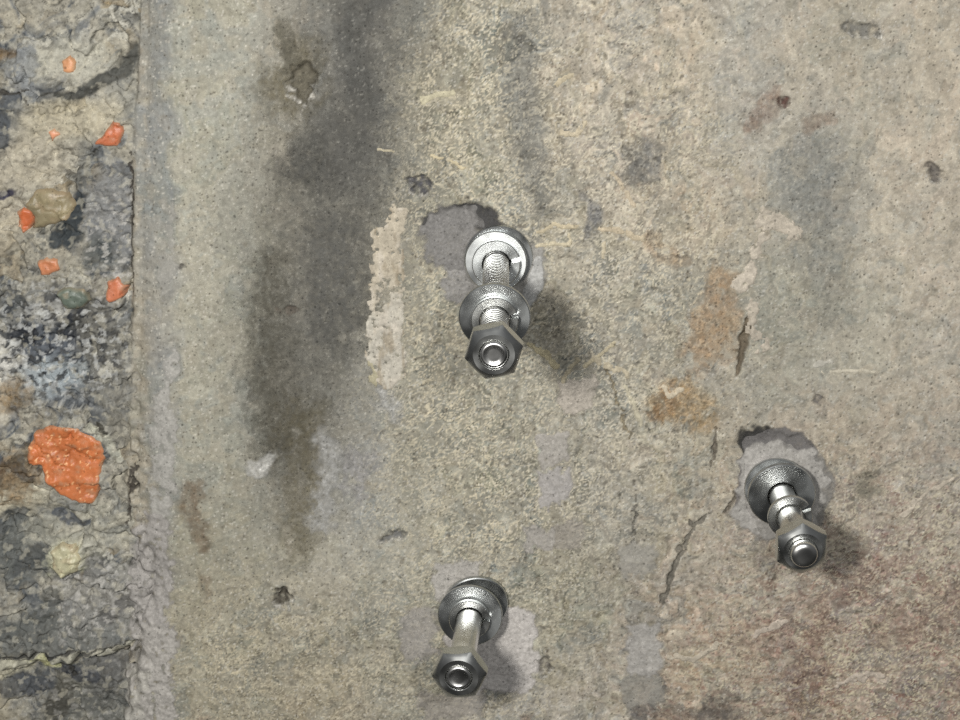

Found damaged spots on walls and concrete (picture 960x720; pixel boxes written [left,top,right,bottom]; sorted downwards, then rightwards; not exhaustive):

water stain [247,101,377,552]
crack [709,427,717,466]
crack [659,491,736,604]